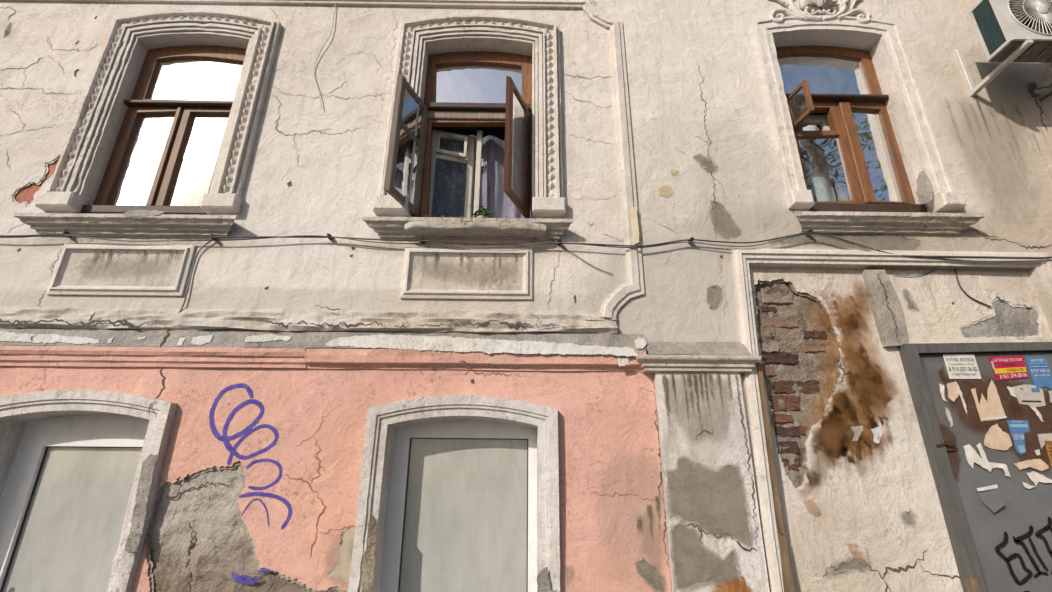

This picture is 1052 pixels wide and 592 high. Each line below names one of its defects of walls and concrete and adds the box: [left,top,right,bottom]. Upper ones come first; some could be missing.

crack [0,38,96,167]
crack [273,14,397,163]
flaking render [12,154,61,207]
crack [0,249,171,414]
peeling [325,334,647,366]
damp [662,373,743,423]
flaking render [754,279,840,488]
flaking render [959,296,1041,340]
flaking render [125,454,379,592]
crack [286,416,355,559]
flaking render [635,456,754,592]
crack [823,550,960,592]